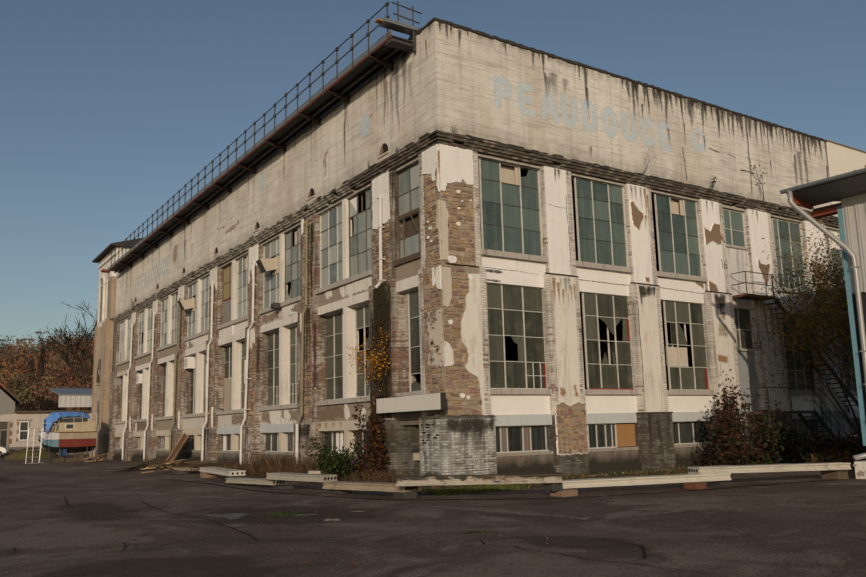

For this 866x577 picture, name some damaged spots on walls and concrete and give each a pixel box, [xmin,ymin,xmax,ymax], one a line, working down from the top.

damp [621,79,829,183]
spalling [629,200,644,232]
spalling [704,222,722,246]
spalling [232,217,350,425]
spalling [325,171,390,418]
spalling [421,144,485,444]
spalling [555,401,589,456]
crack [165,479,452,500]